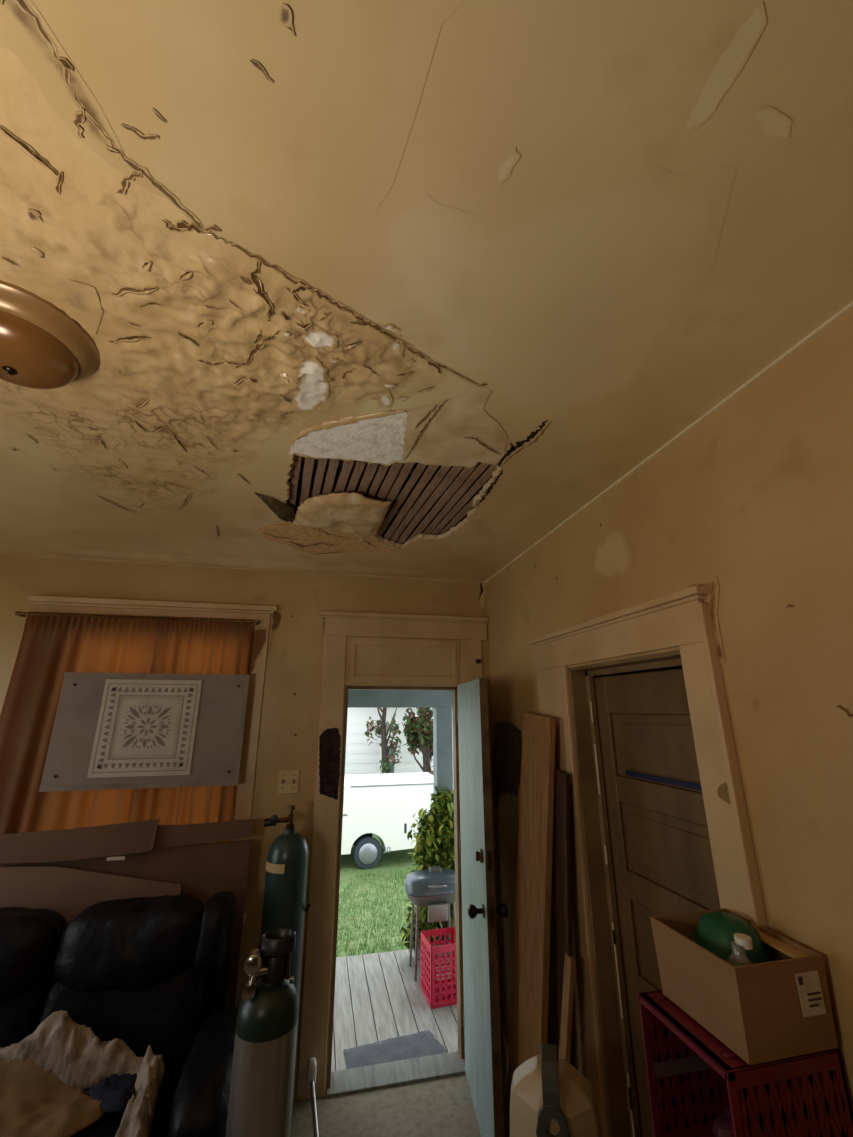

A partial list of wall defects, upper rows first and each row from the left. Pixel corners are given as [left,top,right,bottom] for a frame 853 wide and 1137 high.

crack [0,0,487,387]
peeling [107,322,151,344]
peeling [111,287,162,308]
peeling [133,399,218,452]
peeling [177,276,507,556]
crack [476,420,551,506]